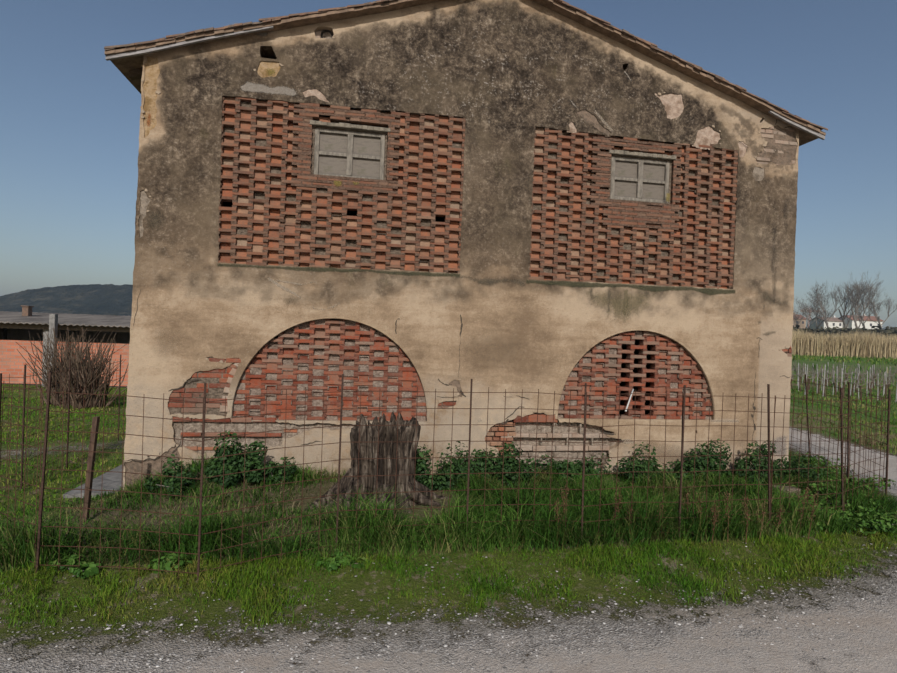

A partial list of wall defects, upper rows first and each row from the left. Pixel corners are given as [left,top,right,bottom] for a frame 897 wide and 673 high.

flaking render [253,57,284,78]
flaking render [303,89,329,102]
flaking render [655,92,684,120]
flaking render [692,125,721,150]
flaking render [737,126,798,181]
leakage [591,289,648,316]
crack [437,315,466,398]
flaking render [437,379,462,408]
flaking render [122,356,356,489]
flaking render [485,413,618,472]